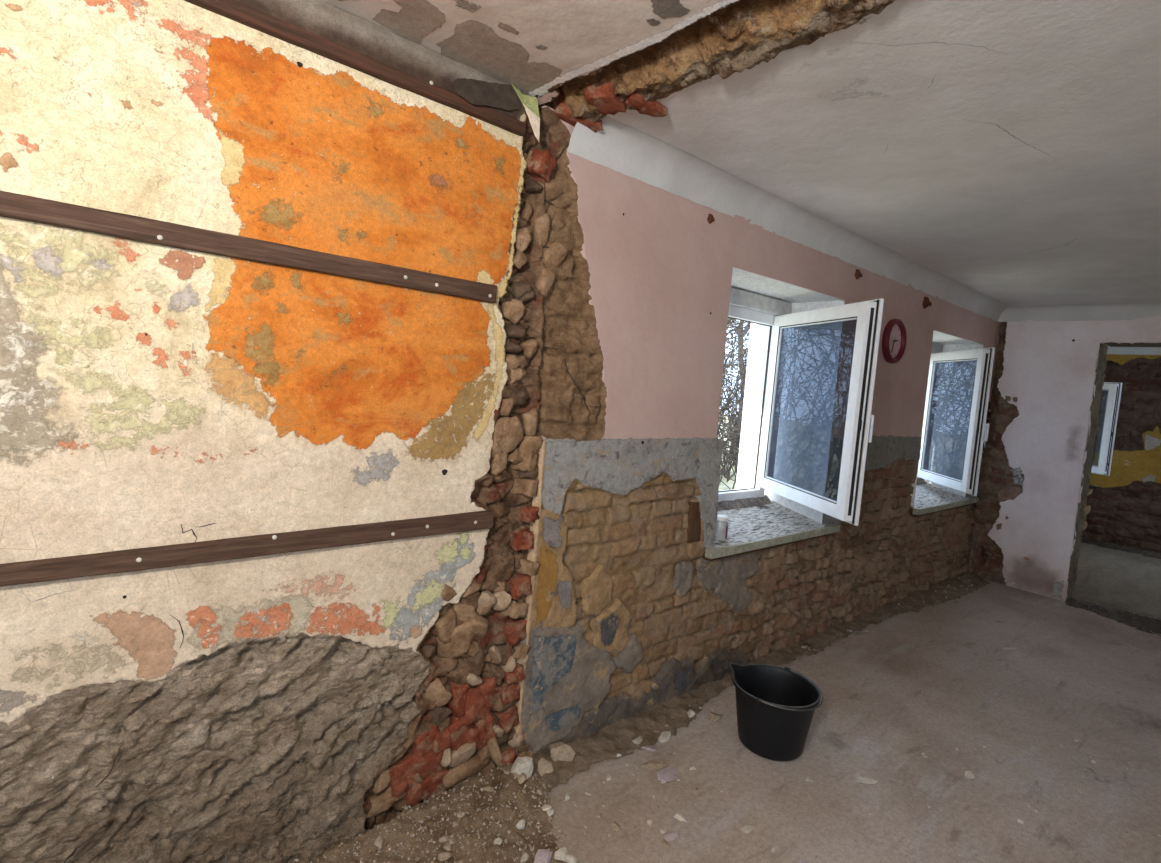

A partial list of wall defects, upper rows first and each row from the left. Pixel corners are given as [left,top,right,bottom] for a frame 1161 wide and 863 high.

peeling [0,0,738,466]
flaking render [537,145,1024,705]
flaking render [1082,474,1161,553]
flaking render [1093,356,1161,453]
flaking render [0,532,475,863]
flaking render [510,740,576,779]